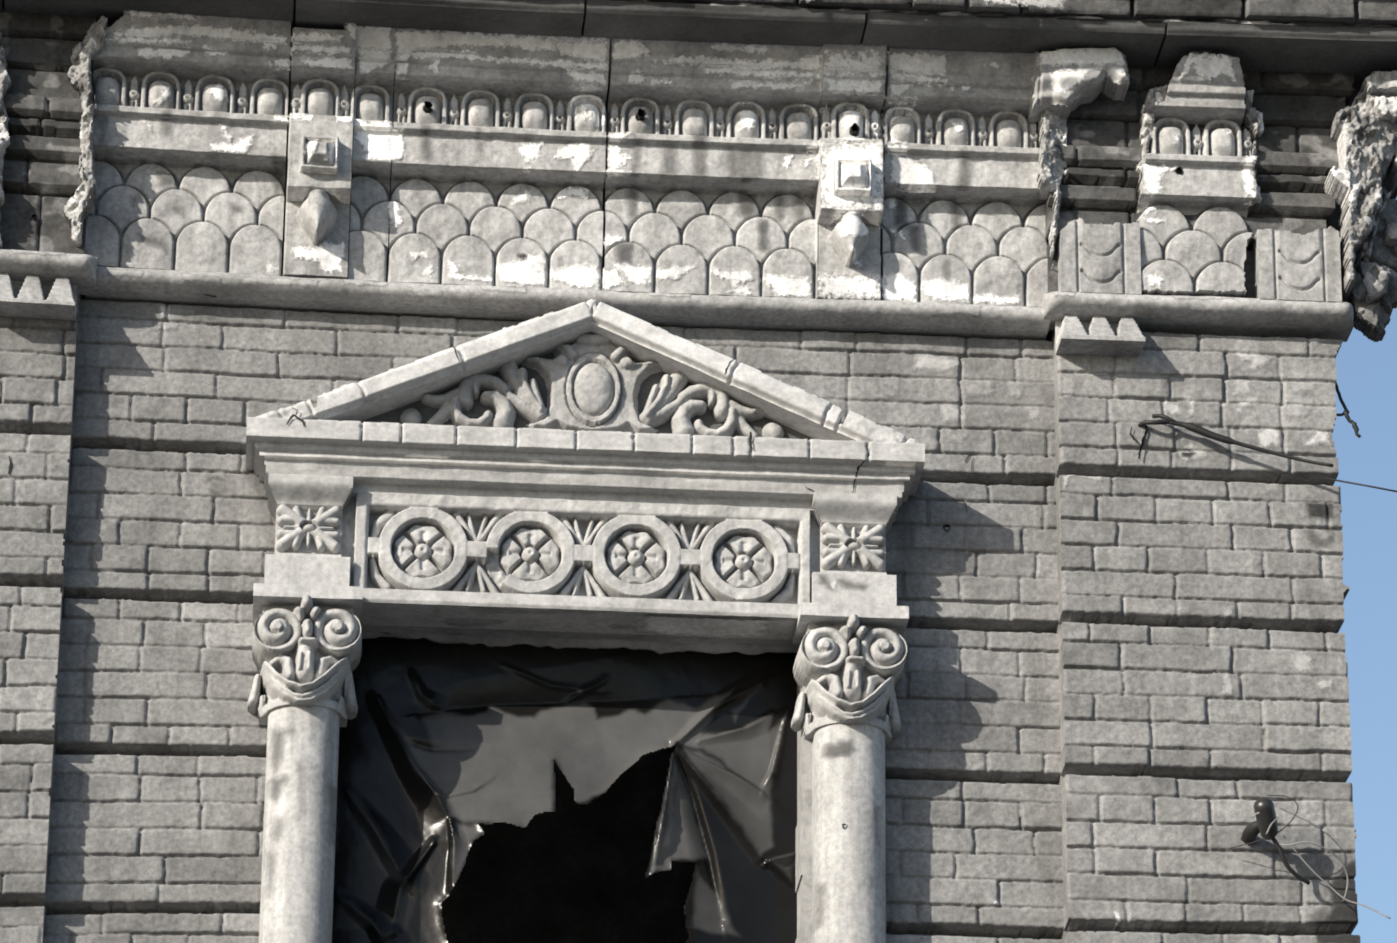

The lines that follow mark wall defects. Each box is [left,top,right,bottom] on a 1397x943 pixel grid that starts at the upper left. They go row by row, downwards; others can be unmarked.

peeling [0,10,1020,316]
spalling [1036,108,1068,270]
peeling [1031,47,1128,95]
spalling [1323,70,1397,342]